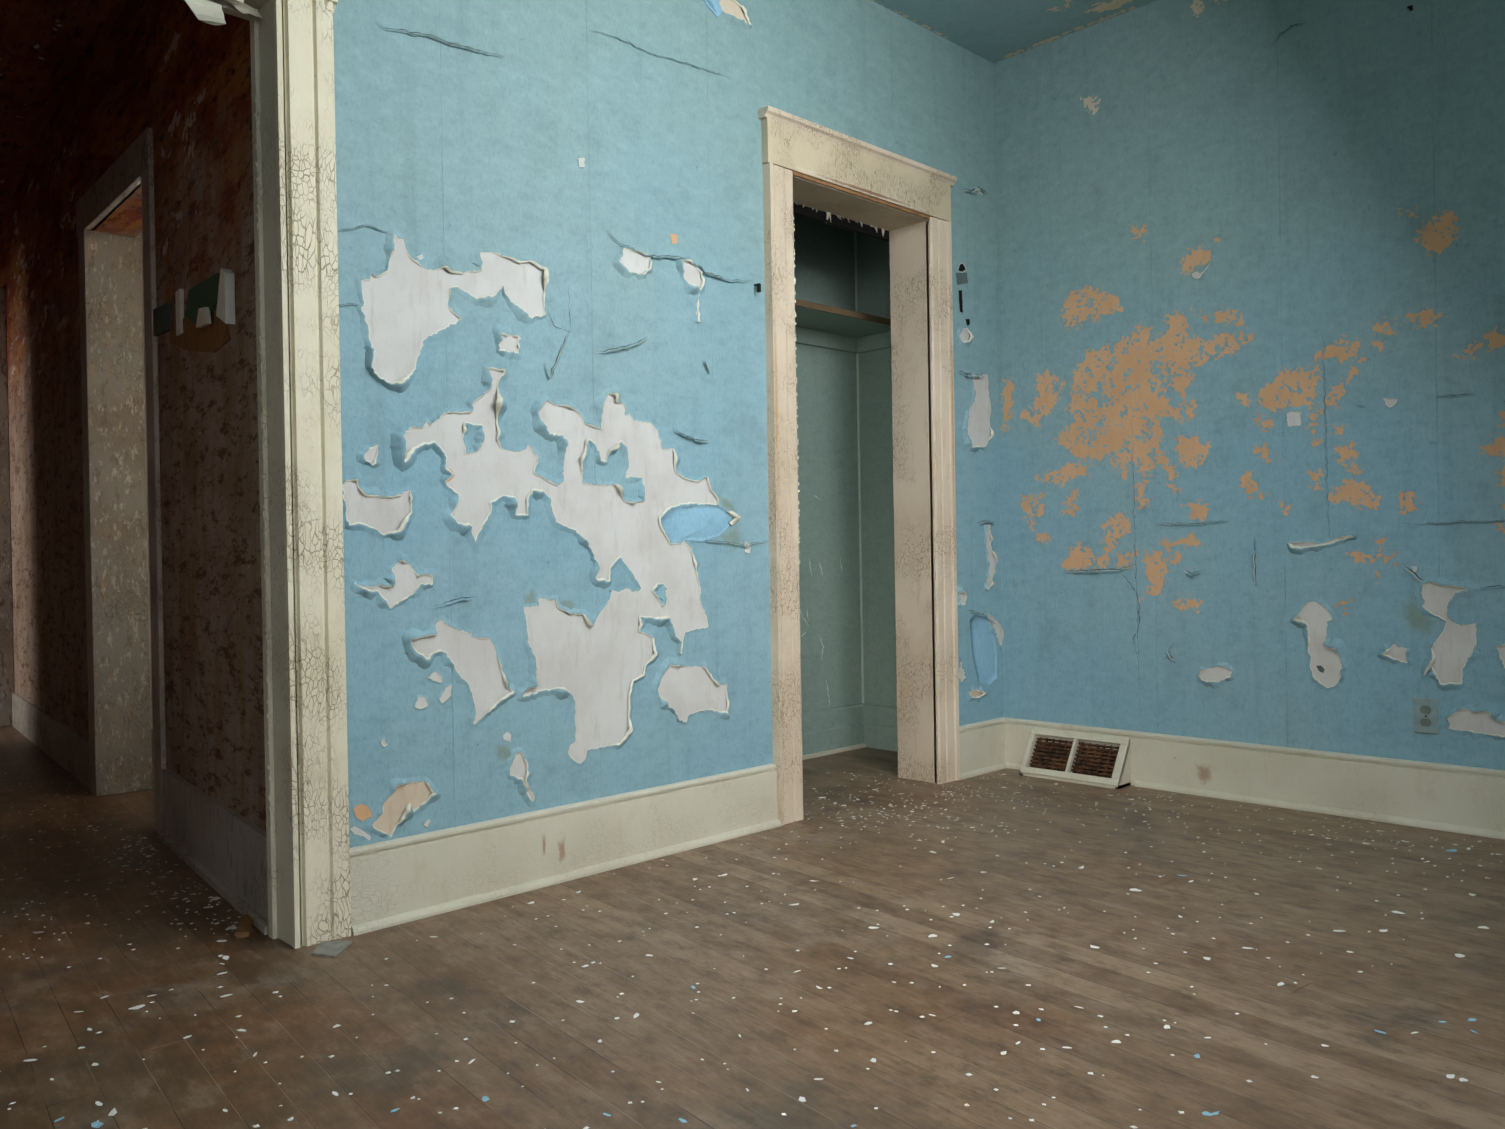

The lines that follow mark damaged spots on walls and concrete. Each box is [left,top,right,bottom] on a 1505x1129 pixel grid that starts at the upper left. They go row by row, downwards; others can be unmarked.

peeling [185,0,264,25]
peeling [703,0,752,29]
peeling [1177,238,1221,281]
peeling [342,227,742,768]
peeling [962,285,1254,614]
peeling [1236,307,1448,516]
peeling [1478,411,1505,541]
peeling [957,584,1004,703]
peeling [1290,597,1354,691]
peeling [1345,534,1505,741]
peeling [350,776,442,841]
peeling [503,732,538,807]